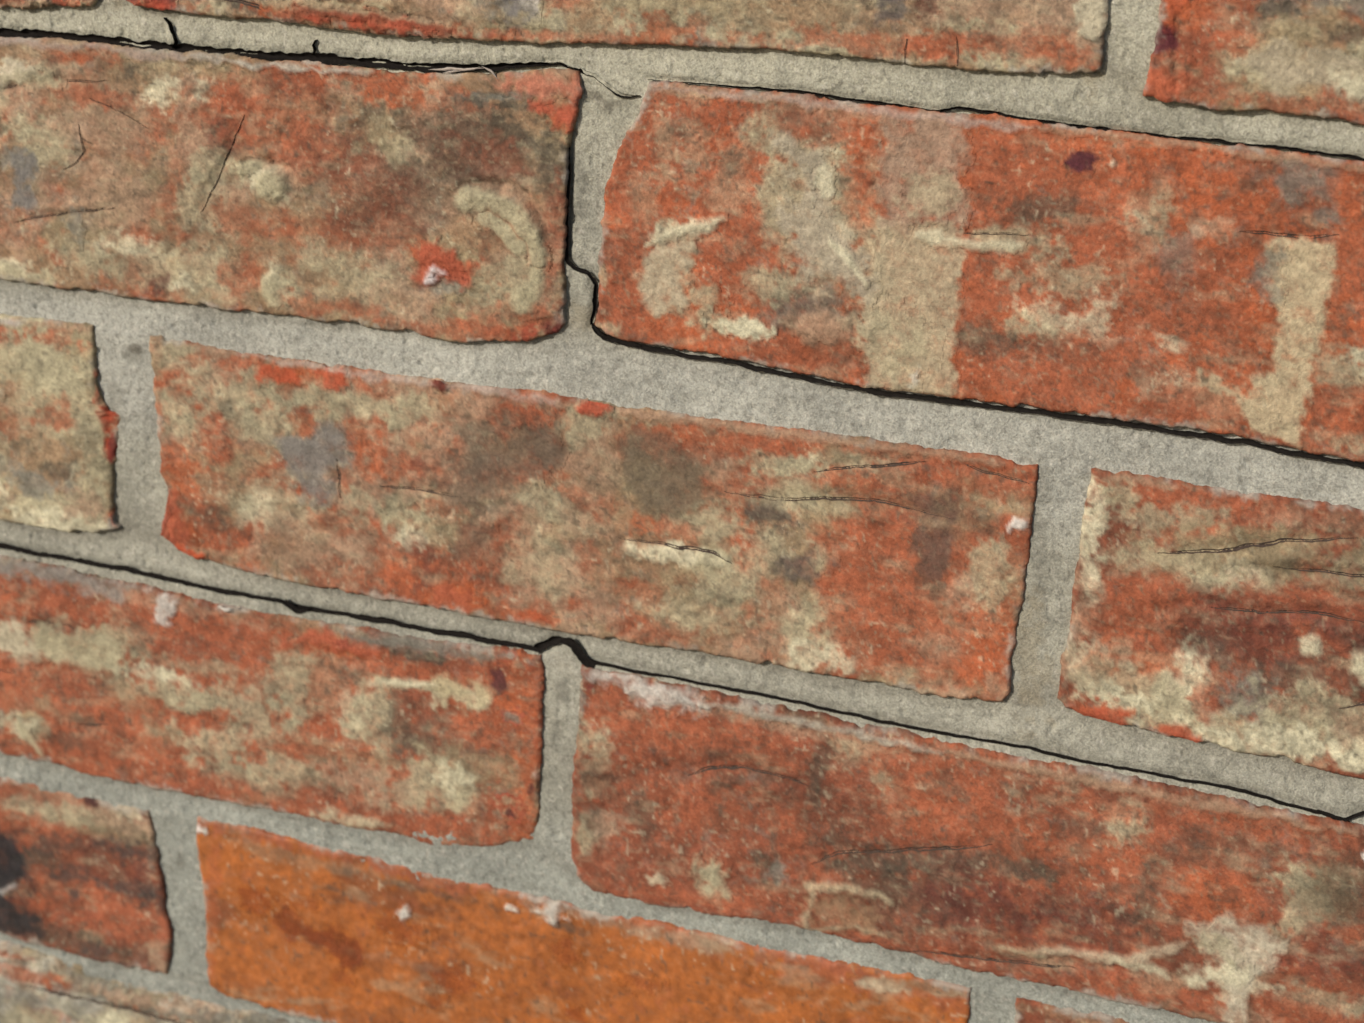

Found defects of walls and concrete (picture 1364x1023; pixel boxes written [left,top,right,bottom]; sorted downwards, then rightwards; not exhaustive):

crack [0,17,1364,168]
crack [565,143,642,347]
crack [0,543,1364,822]